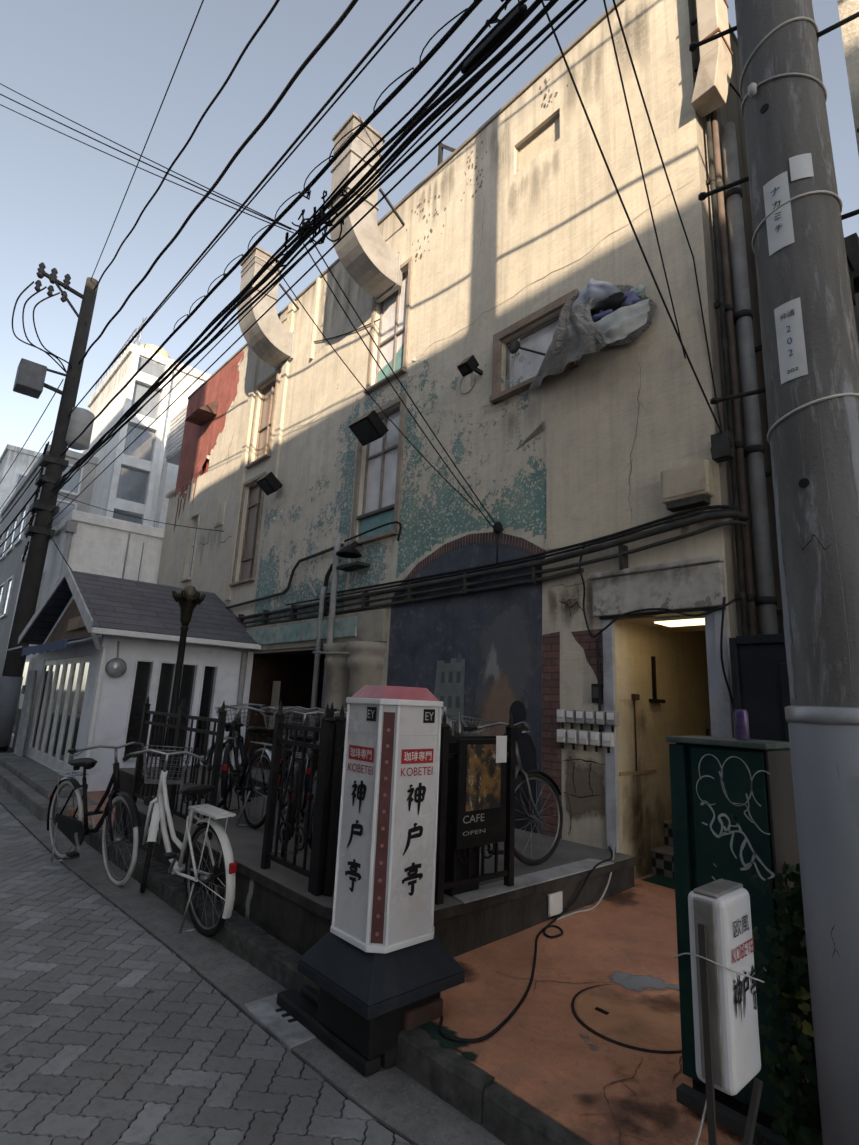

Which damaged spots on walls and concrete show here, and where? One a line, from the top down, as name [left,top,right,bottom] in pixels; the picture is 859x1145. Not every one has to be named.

peeling [174,351,245,529]
peeling [253,338,546,625]
crack [623,359,645,525]
crack [584,1057,651,1145]